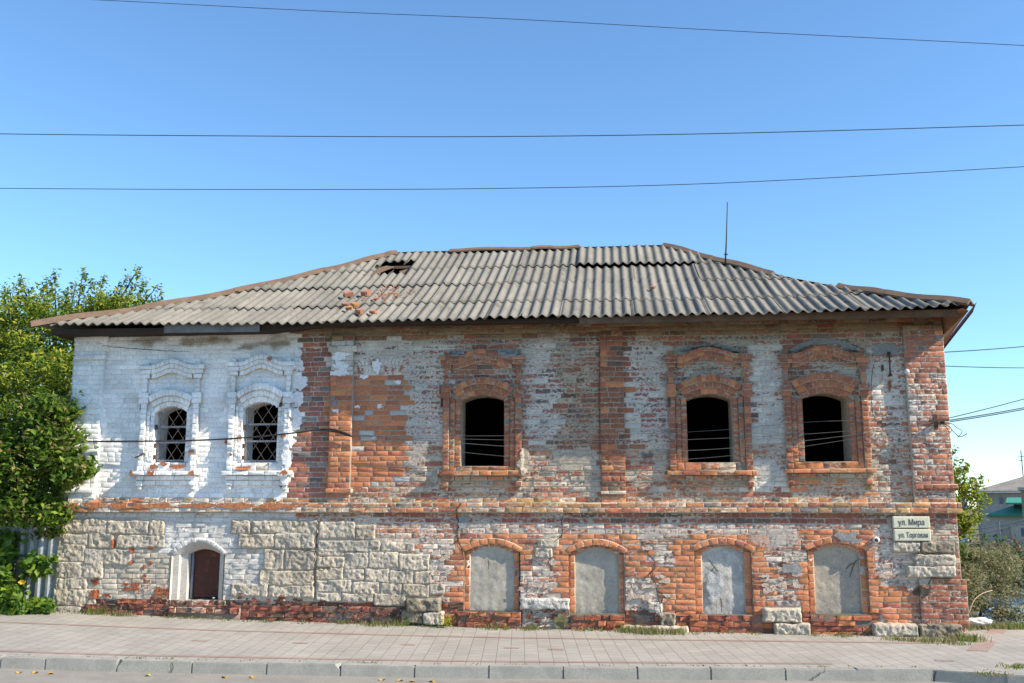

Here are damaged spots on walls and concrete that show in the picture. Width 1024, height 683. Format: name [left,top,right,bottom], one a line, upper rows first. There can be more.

peeling [330,351,382,379]
spalling [641,545,676,563]
spalling [517,557,561,594]
spalling [230,594,402,625]
spalling [469,608,619,631]
spalling [626,575,674,617]